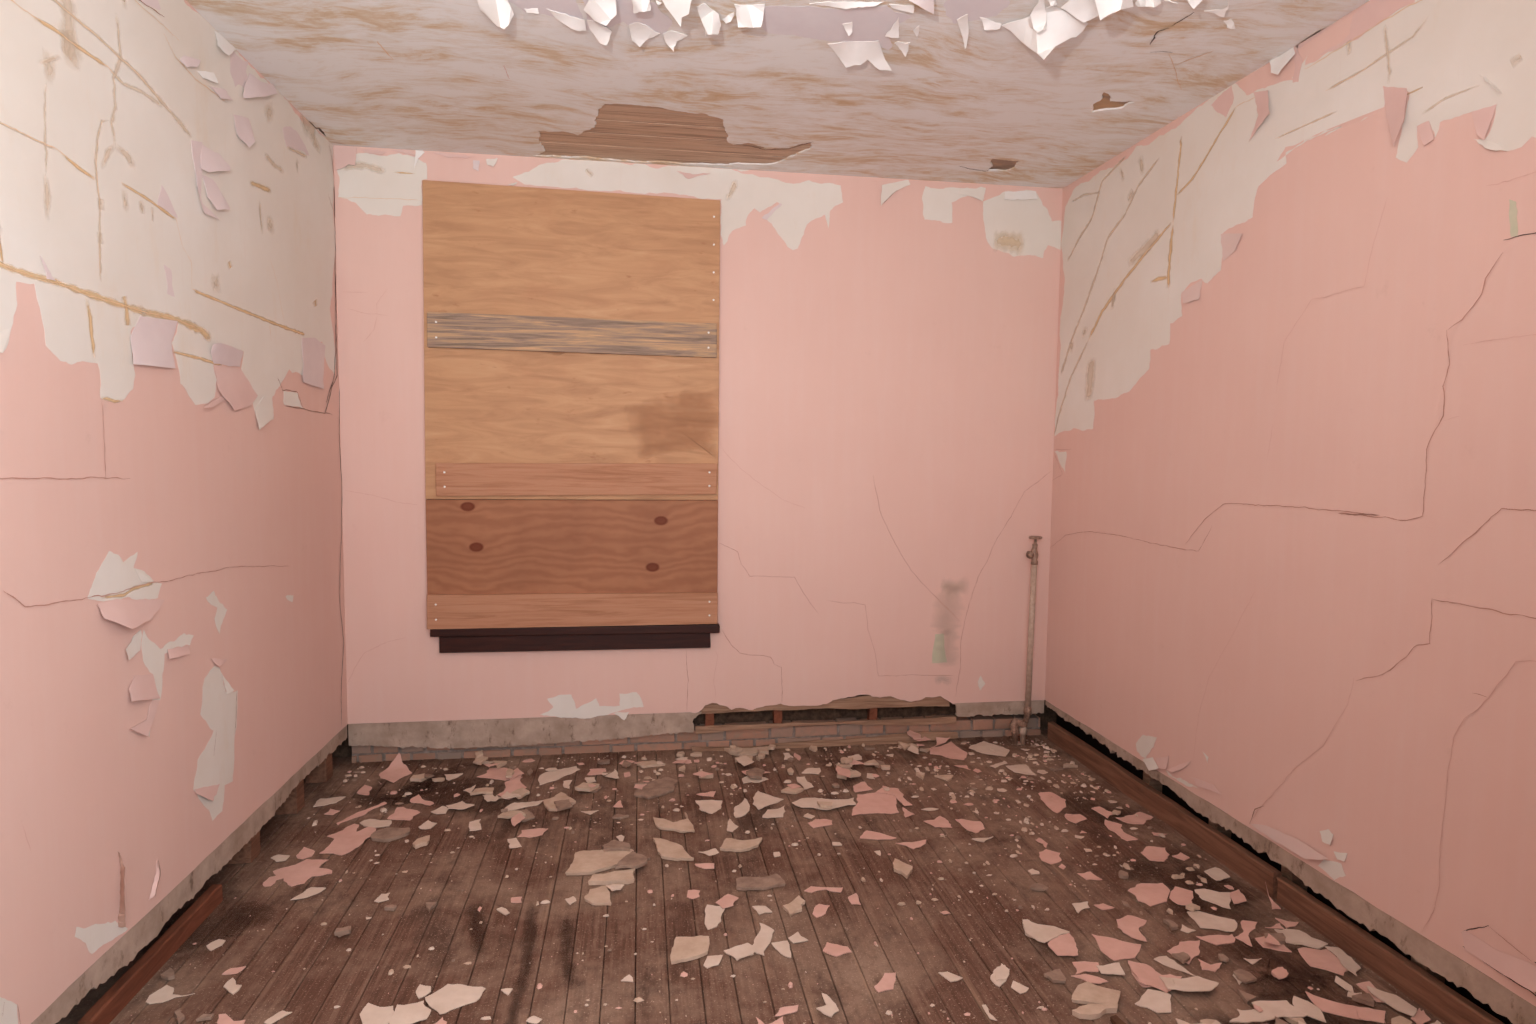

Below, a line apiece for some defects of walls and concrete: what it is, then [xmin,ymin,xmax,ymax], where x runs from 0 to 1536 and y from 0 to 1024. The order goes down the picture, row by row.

peeling [477,0,1235,71]
peeling [0,0,498,429]
peeling [509,159,843,250]
peeling [922,0,1536,479]
crack [0,406,130,480]
crack [1053,233,1536,551]
crack [1442,508,1536,562]
peeling [88,551,194,737]
peeling [193,658,238,821]
peeling [540,692,644,720]
crack [1250,599,1536,822]
peeling [0,997,20,1024]